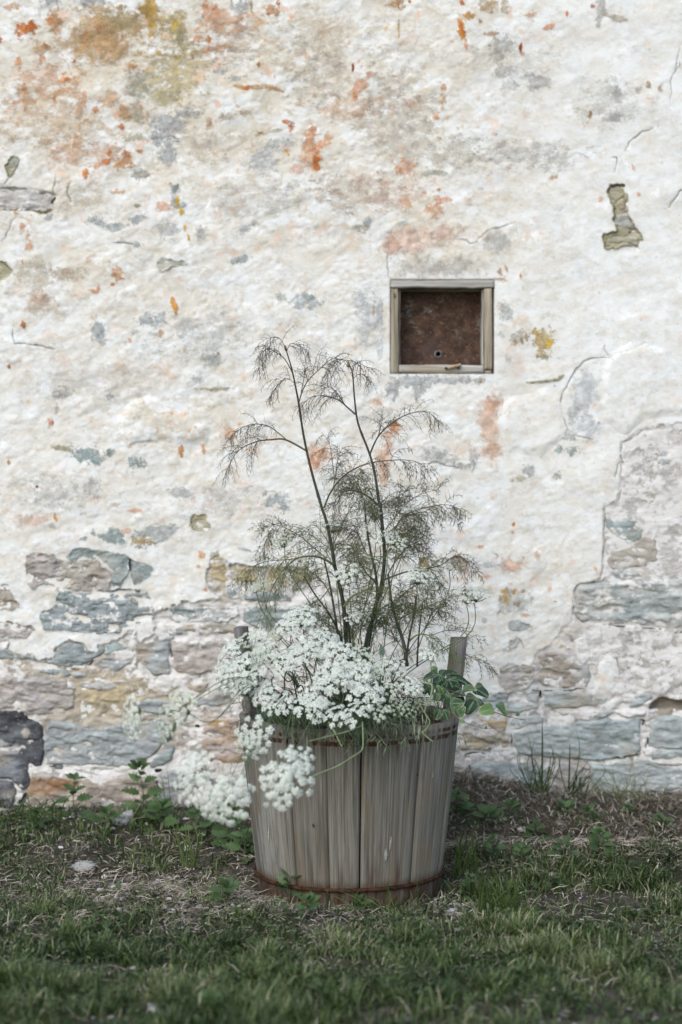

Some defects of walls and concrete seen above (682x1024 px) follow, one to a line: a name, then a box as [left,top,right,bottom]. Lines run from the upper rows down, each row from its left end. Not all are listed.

spalling [602,183,643,249]
crack [560,345,610,439]
spalling [0,514,354,807]
spalling [451,421,682,801]